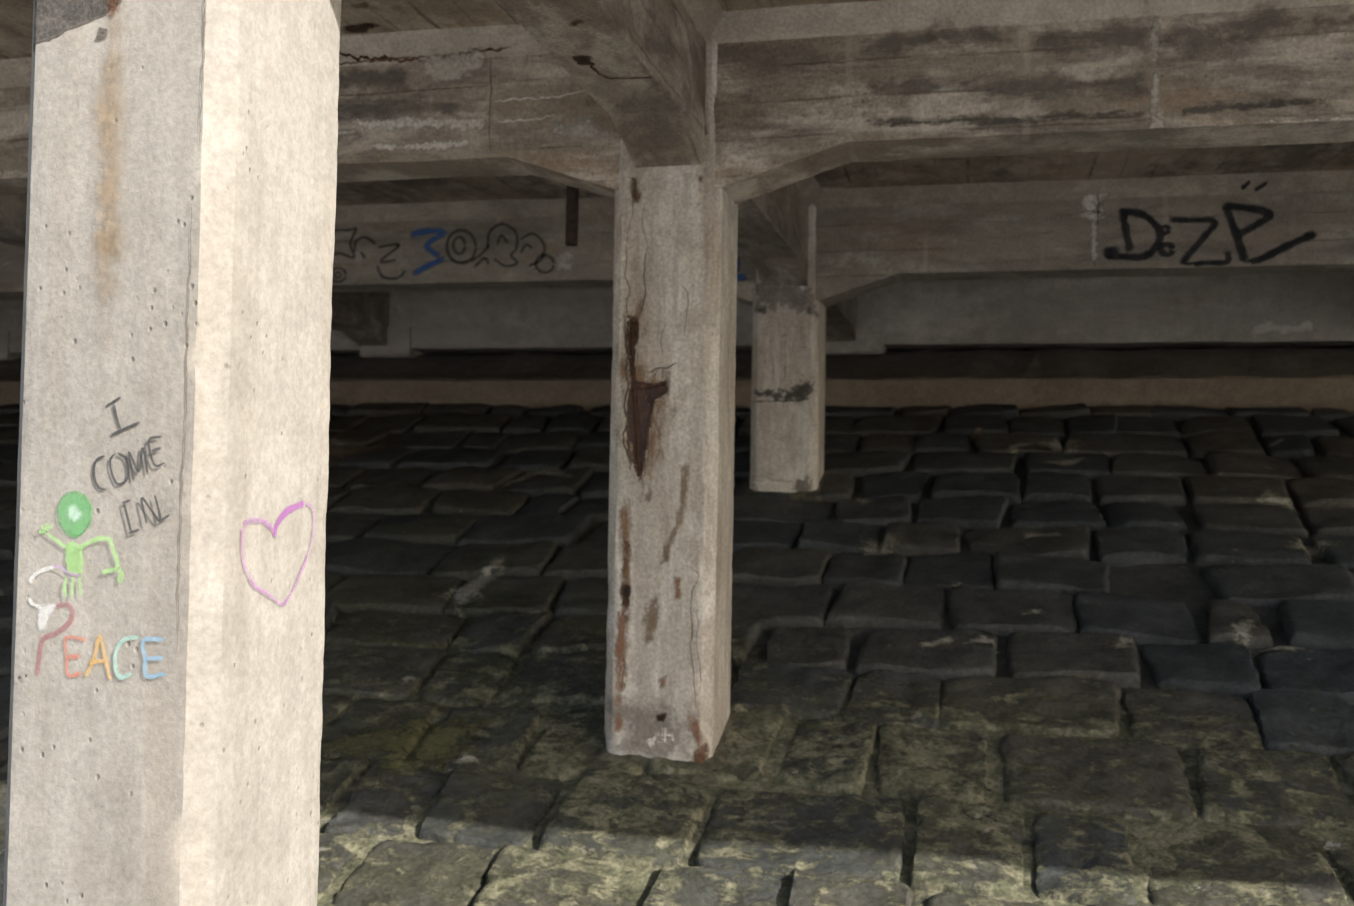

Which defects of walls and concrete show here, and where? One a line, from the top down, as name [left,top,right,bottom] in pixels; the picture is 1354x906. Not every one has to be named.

crack [338,23,511,150]
crack [570,20,654,79]
leakage [865,5,1354,128]
corrosion [661,466,689,564]
corrosion [614,492,659,731]
corrosion [687,712,709,764]